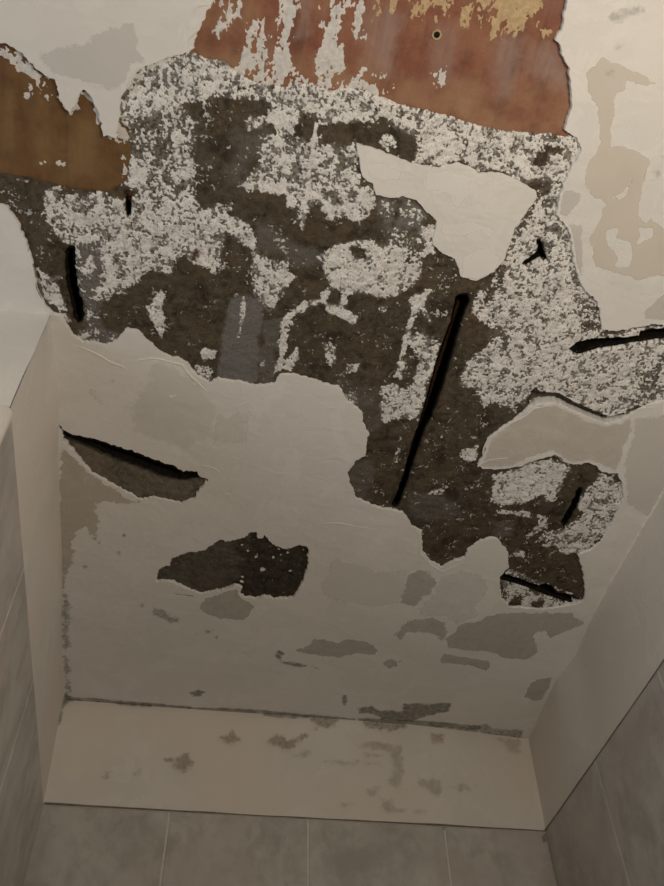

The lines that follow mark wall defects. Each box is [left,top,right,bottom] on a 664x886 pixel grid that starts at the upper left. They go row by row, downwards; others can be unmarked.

crack [65,245,84,323]
spalling [0,53,664,670]
crack [392,293,469,507]
crack [570,328,664,354]
crack [60,426,199,480]
crack [500,574,579,602]
crack [44,659,664,832]